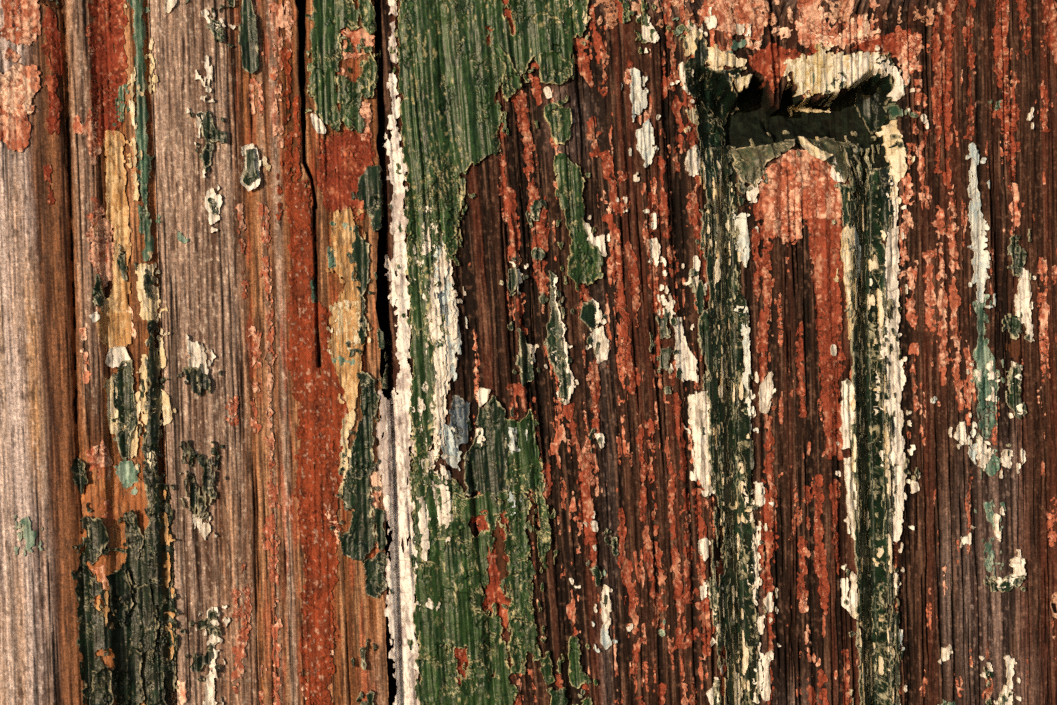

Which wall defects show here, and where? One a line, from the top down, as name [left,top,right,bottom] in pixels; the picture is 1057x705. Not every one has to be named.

peeling [0,0,128,165]
peeling [163,0,189,13]
peeling [186,55,227,233]
crack [295,0,318,303]
peeling [992,0,1057,342]
peeling [71,197,253,705]
peeling [201,0,1027,705]
peeling [1046,510,1057,542]